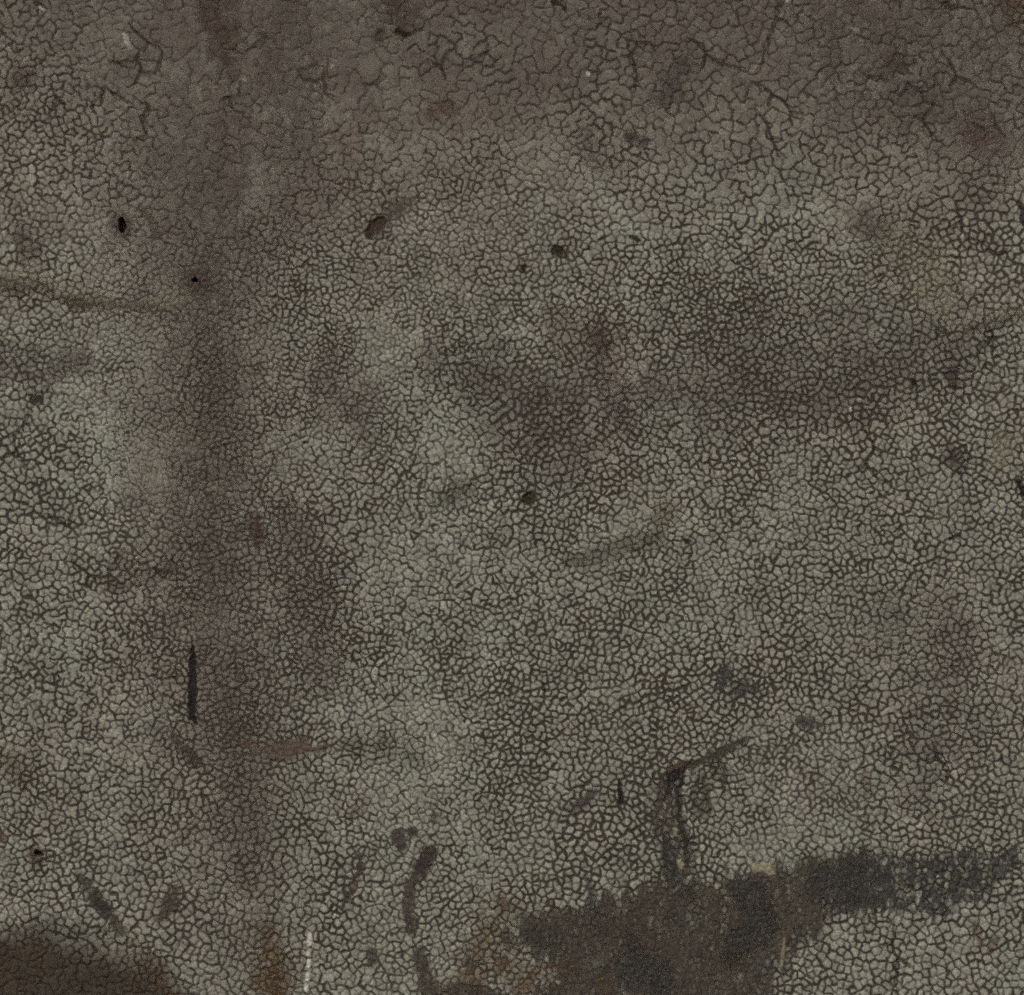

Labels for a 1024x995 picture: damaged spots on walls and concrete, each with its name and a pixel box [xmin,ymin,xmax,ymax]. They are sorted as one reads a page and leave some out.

crack [44,23,163,142]
crack [426,42,497,79]
crack [621,37,656,91]
crack [686,3,803,157]
crack [858,51,977,140]
crack [950,203,1007,255]
crack [0,413,29,468]
crack [856,430,890,485]
crack [45,513,124,587]
leakage [808,843,1018,923]
leakage [0,937,170,995]
crack [882,921,911,985]